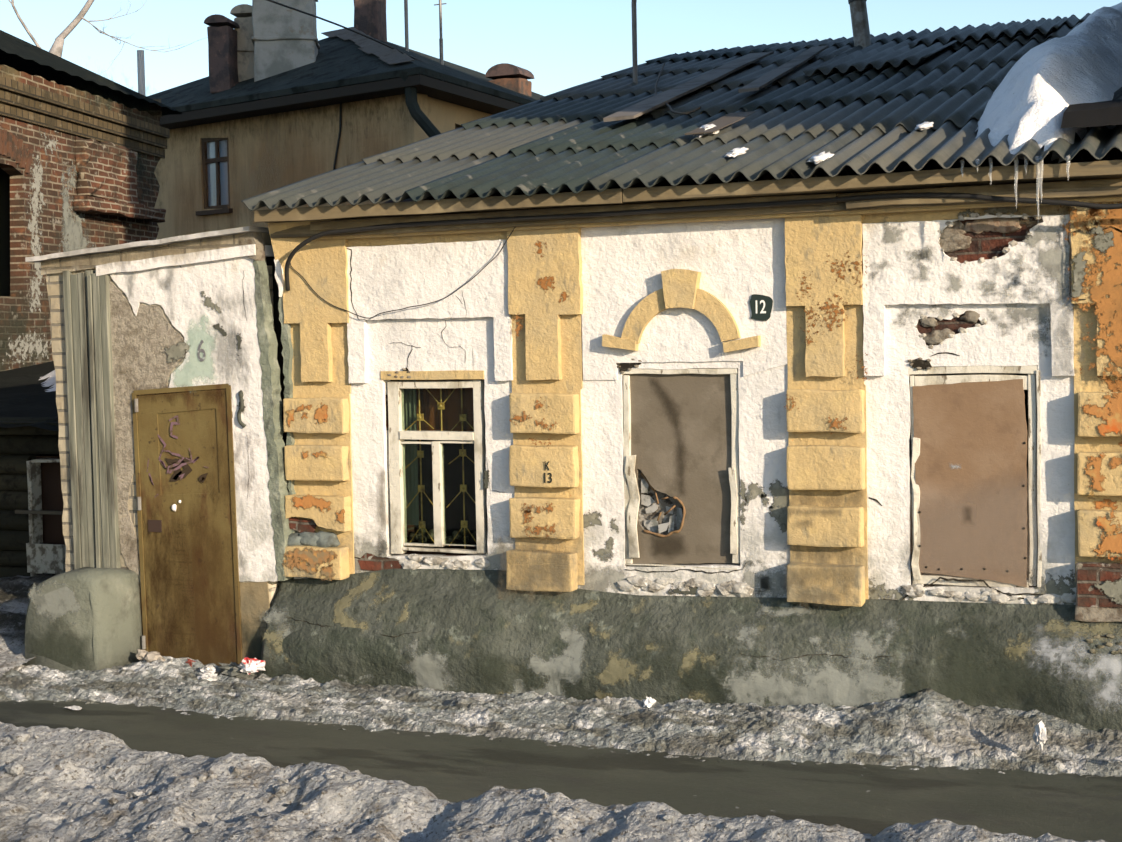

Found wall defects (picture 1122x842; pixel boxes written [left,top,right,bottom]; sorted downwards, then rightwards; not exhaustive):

spalling [937,206,1043,264]
flaking render [200,291,242,361]
spalling [908,310,987,370]
peeling [1005,202,1122,660]
peeling [739,479,789,532]
peeling [282,494,345,581]
damp [581,567,637,593]
damp [742,556,788,598]
efflorescence [263,608,293,640]
damp [561,679,591,701]
damp [691,663,728,704]
damp [917,631,1122,715]